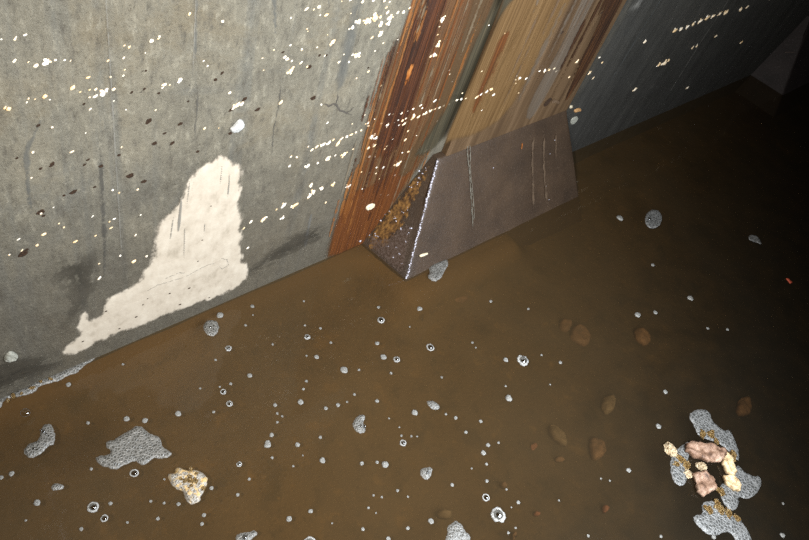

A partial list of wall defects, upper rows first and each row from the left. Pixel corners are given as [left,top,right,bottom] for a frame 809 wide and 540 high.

rust [328,0,494,270]
rust [448,0,569,141]
rust [558,0,623,100]
peeling [63,155,248,355]
damp [0,362,46,387]